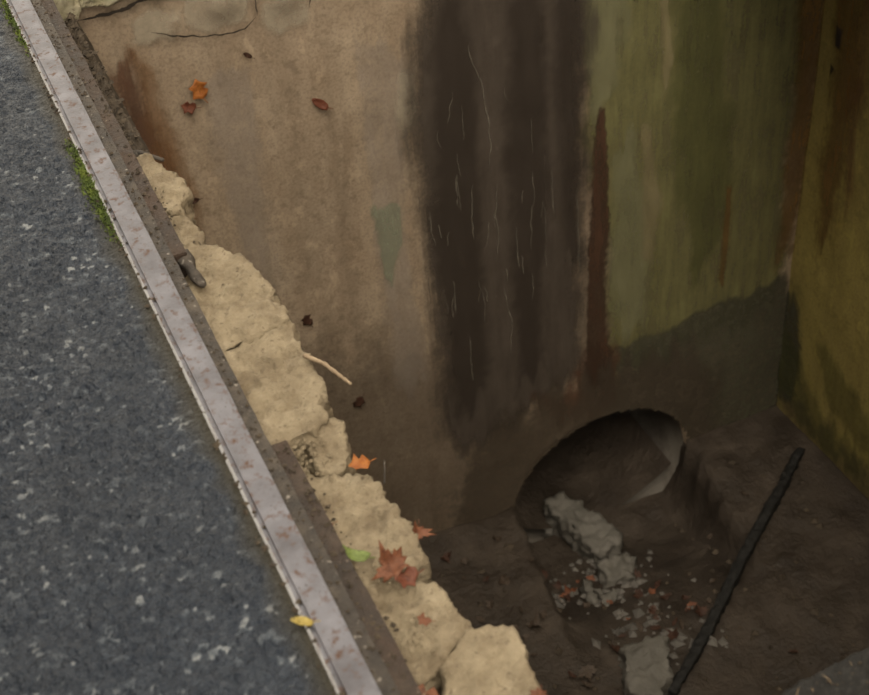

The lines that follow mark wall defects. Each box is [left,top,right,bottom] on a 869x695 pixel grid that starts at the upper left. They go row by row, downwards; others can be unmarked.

crack [79,0,146,21]
crack [151,0,258,38]
rust [563,108,619,408]
damp [405,0,801,526]